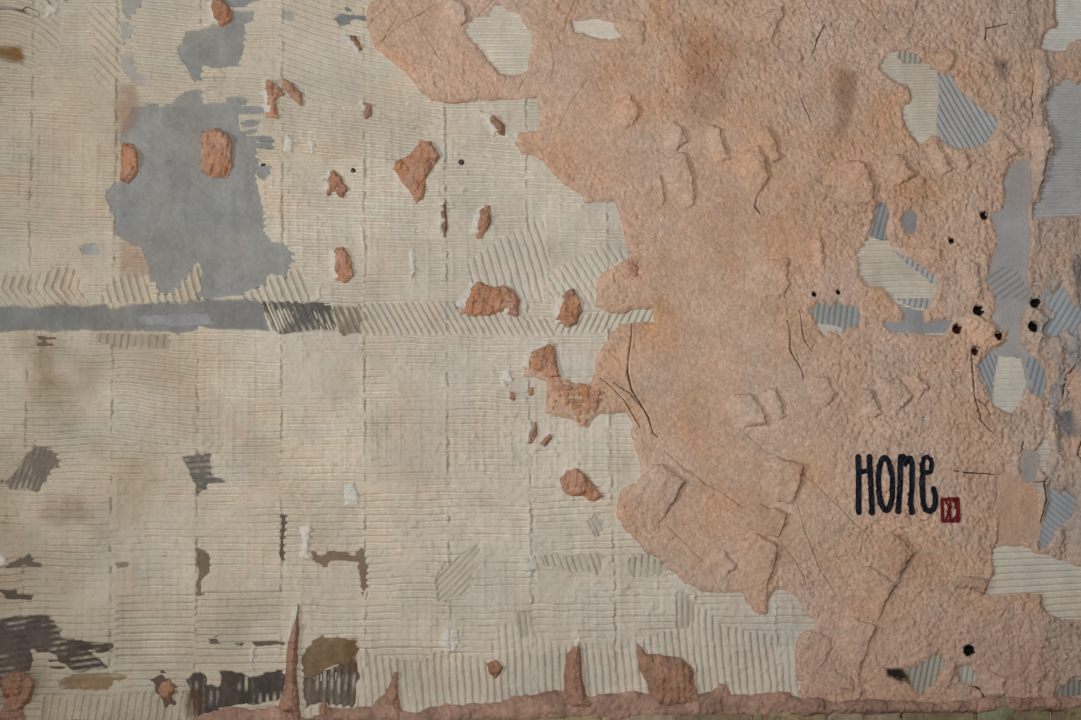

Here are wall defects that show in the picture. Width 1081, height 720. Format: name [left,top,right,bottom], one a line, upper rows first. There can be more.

spalling [466,5,532,75]
spalling [1042,0,1081,51]
spalling [880,49,998,148]
peeling [0,0,366,347]
spalling [857,203,953,335]
spalling [978,77,1081,414]
peeling [1,440,61,492]
peeling [183,453,225,496]
peeling [196,548,211,596]
peeling [311,548,368,597]
spalling [986,486,1081,620]
peeling [0,615,128,691]